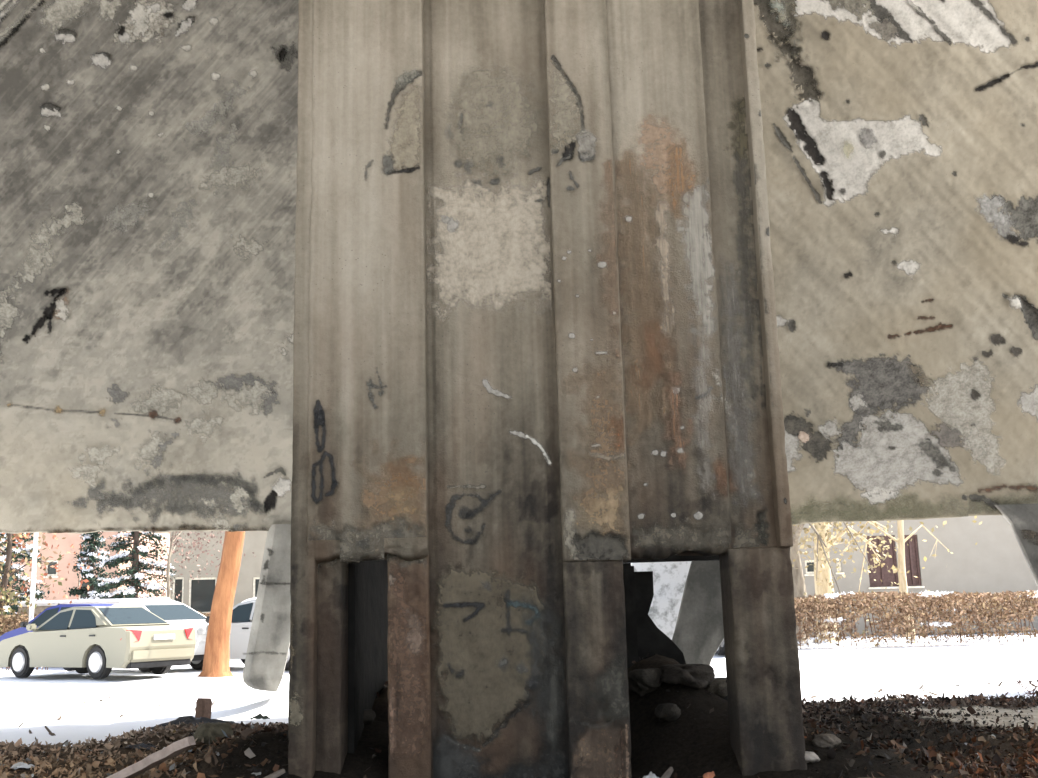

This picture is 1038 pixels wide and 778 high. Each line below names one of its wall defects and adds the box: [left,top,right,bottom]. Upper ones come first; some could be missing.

peeling [794,0,1029,53]
spalling [365,70,422,178]
peeling [773,98,942,207]
peeling [427,173,552,319]
rust [617,115,696,468]
spalling [1002,294,1038,340]
crack [7,404,181,424]
peeling [784,350,1006,504]
peeling [1018,385,1038,421]
damp [109,475,259,512]
rust [576,484,624,536]